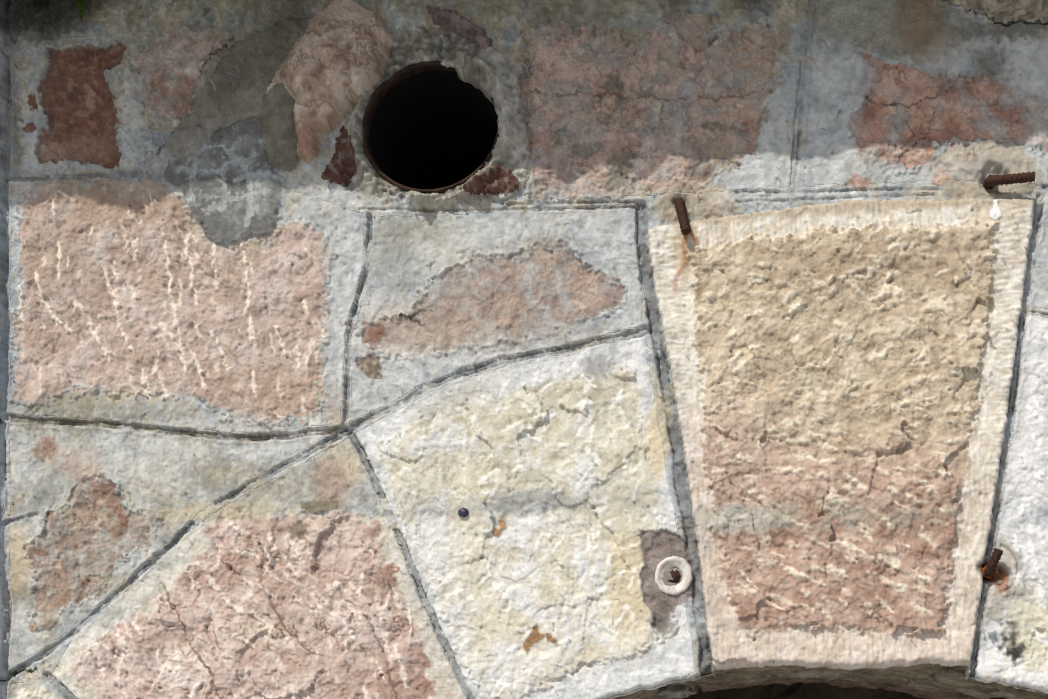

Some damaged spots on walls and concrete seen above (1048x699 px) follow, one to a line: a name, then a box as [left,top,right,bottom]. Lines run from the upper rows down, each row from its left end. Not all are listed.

rust [682,231,699,269]
rust [493,516,506,537]
rust [979,565,1008,588]
crack [256,537,323,656]
crack [159,588,222,699]
crack [342,597,397,698]
rust [524,625,556,653]